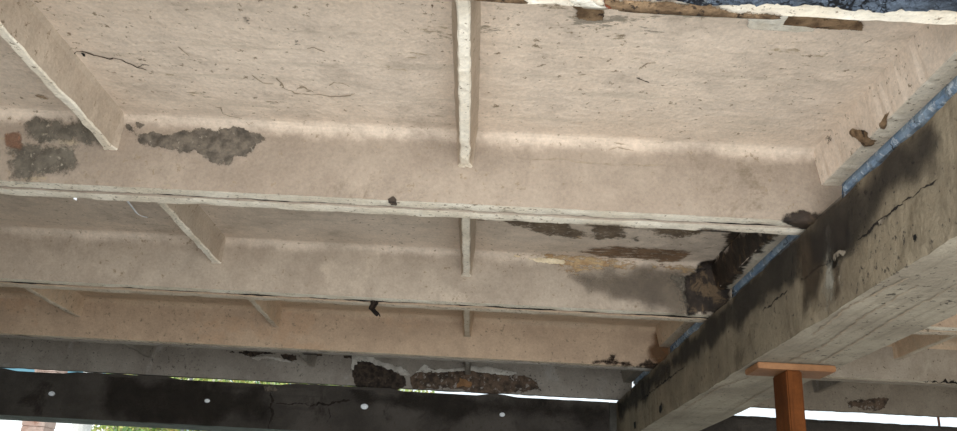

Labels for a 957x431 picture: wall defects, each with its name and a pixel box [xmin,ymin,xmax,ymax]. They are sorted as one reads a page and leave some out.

crack [74,51,146,70]
water stain [5,116,99,182]
crack [858,179,938,240]
water stain [504,221,638,241]
water stain [578,128,936,418]
spalling [230,350,322,363]
spalling [343,355,541,394]